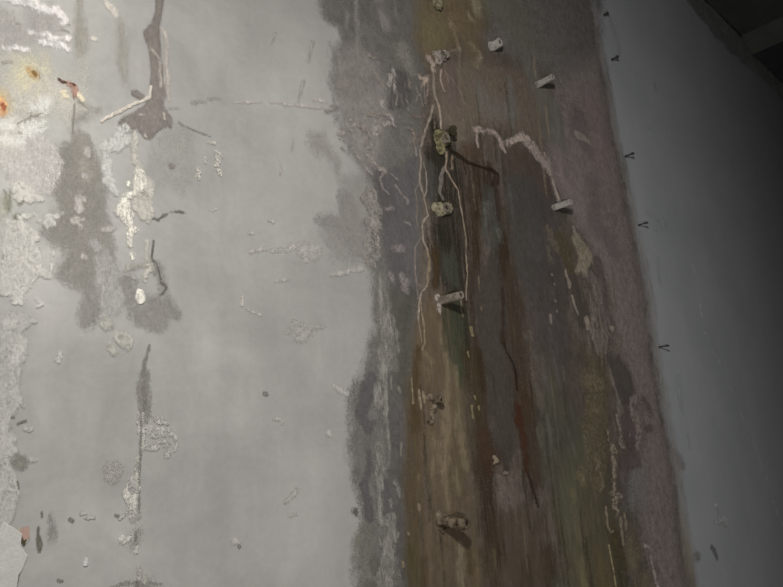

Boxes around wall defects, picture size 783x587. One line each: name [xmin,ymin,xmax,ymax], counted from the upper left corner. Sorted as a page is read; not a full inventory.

peeling [0,0,72,66]
leakage [39,0,223,356]
crack [152,210,187,221]
crack [448,140,502,222]
crack [147,240,184,323]
leakage [303,0,699,587]
peeling [0,95,86,587]
crack [500,286,518,391]
crack [114,344,152,554]
crack [35,513,75,553]
crack [112,578,163,587]